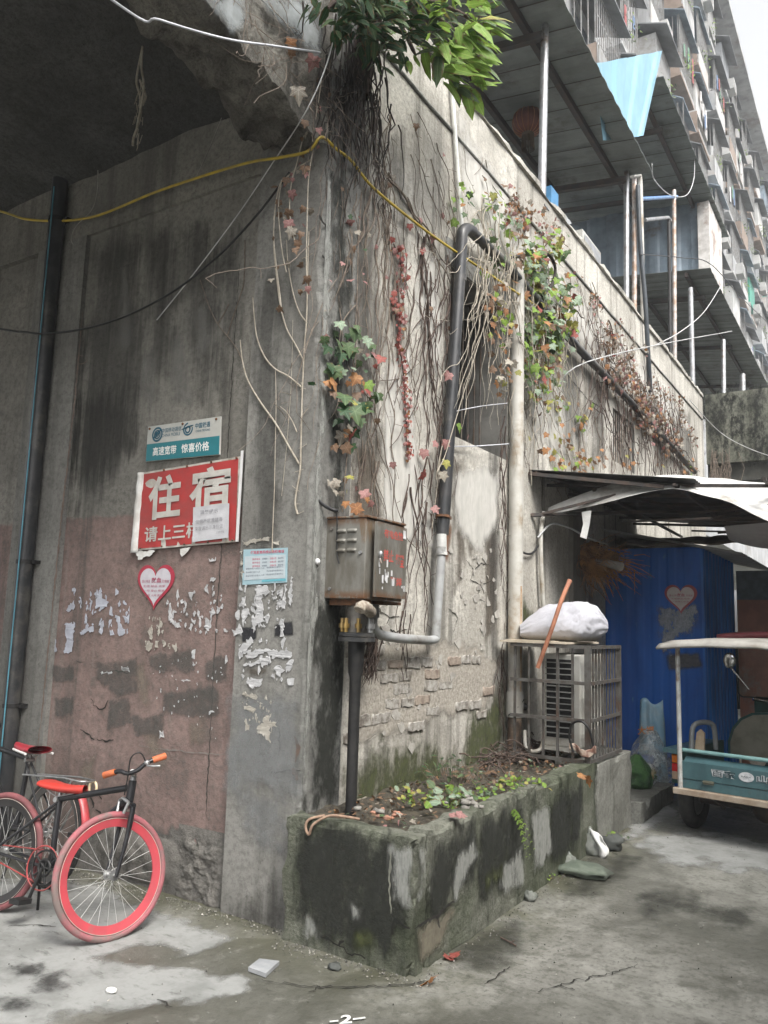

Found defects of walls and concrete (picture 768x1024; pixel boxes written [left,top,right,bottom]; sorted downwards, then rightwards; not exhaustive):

crack [227,267,240,457]
peeling [384,350,453,553]
peeling [415,256,441,375]
crack [143,543,223,817]
spalling [343,467,500,754]